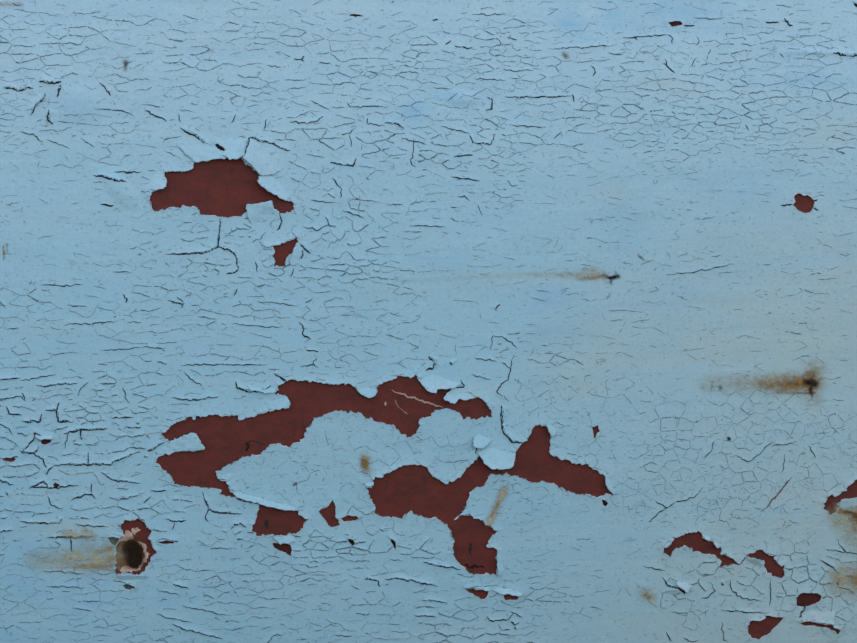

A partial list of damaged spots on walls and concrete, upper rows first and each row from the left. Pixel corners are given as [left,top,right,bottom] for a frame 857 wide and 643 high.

peeling [149,137,295,225]
crack [467,209,636,306]
crack [622,250,740,279]
crack [751,260,850,363]
rust [739,367,820,394]
rust [43,527,149,574]
peeling [155,374,493,557]
crack [317,414,470,480]
peeling [361,423,615,601]
crack [455,310,857,643]
peeling [663,531,785,579]
peeling [747,615,785,640]